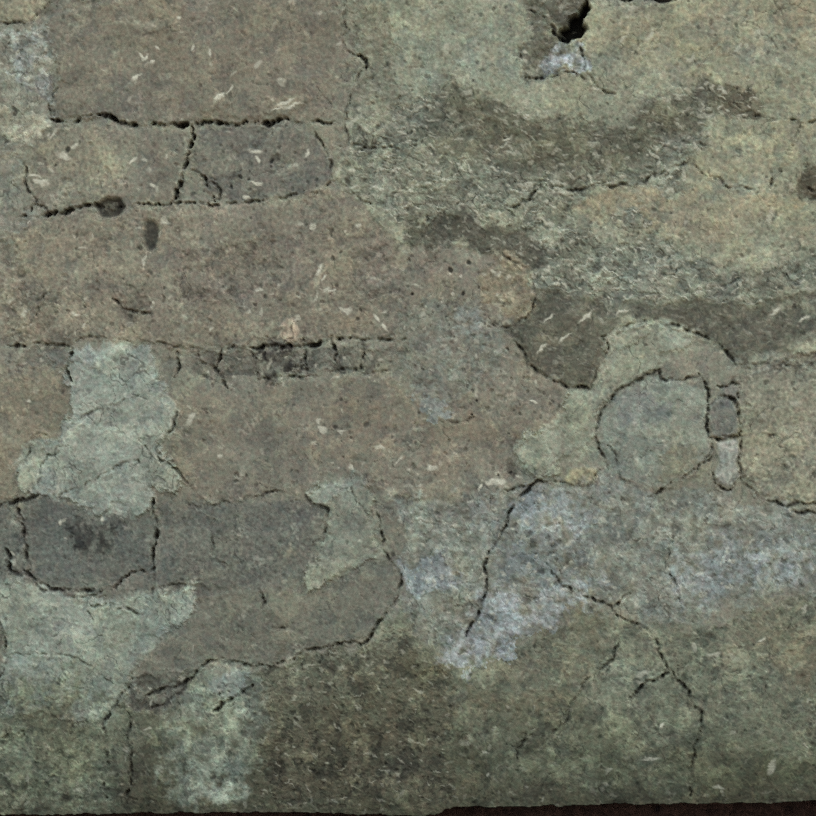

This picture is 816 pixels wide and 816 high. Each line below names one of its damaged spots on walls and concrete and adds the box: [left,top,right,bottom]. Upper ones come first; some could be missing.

crack [17,162,97,220]
flaking render [6,339,183,524]
crack [6,335,406,389]
crack [47,0,399,209]
flaking render [300,468,390,596]
spalling [512,0,596,86]
crack [517,39,615,95]
spalling [331,66,816,485]
crack [464,253,816,637]
crack [508,114,816,211]
flaking render [0,571,480,814]
crack [546,563,705,797]